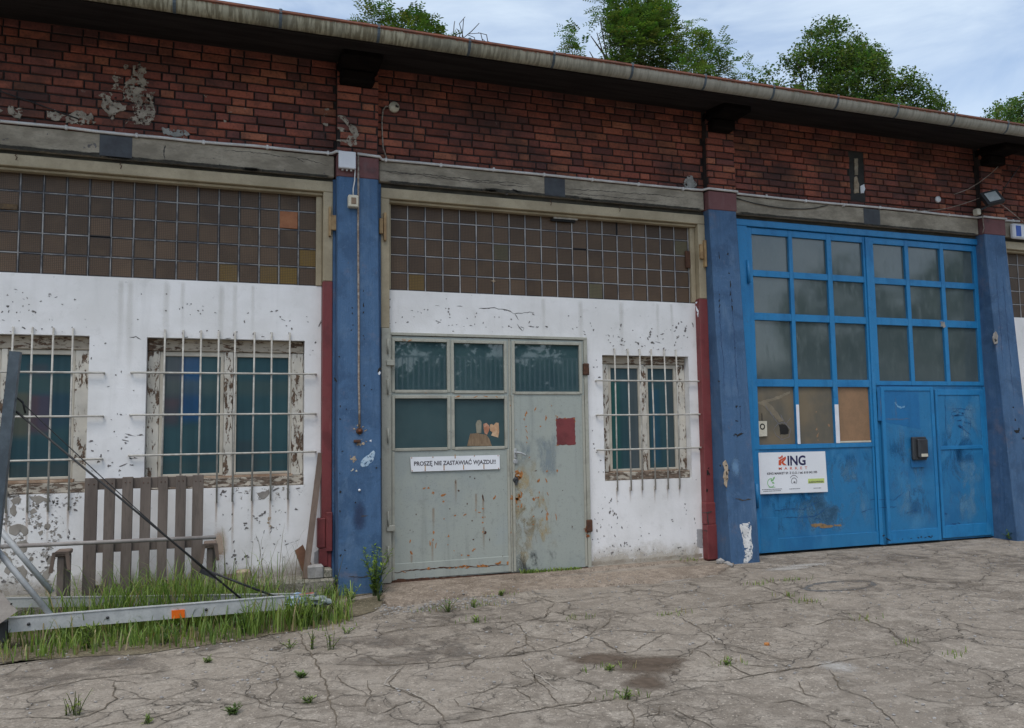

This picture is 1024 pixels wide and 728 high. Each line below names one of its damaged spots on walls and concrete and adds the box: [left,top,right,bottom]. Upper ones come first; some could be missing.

peeling [47,64,190,138]
peeling [336,115,359,147]
peeling [0,490,84,593]
corrosion [392,481,509,582]
corrosion [510,470,558,525]
peeling [740,522,753,563]